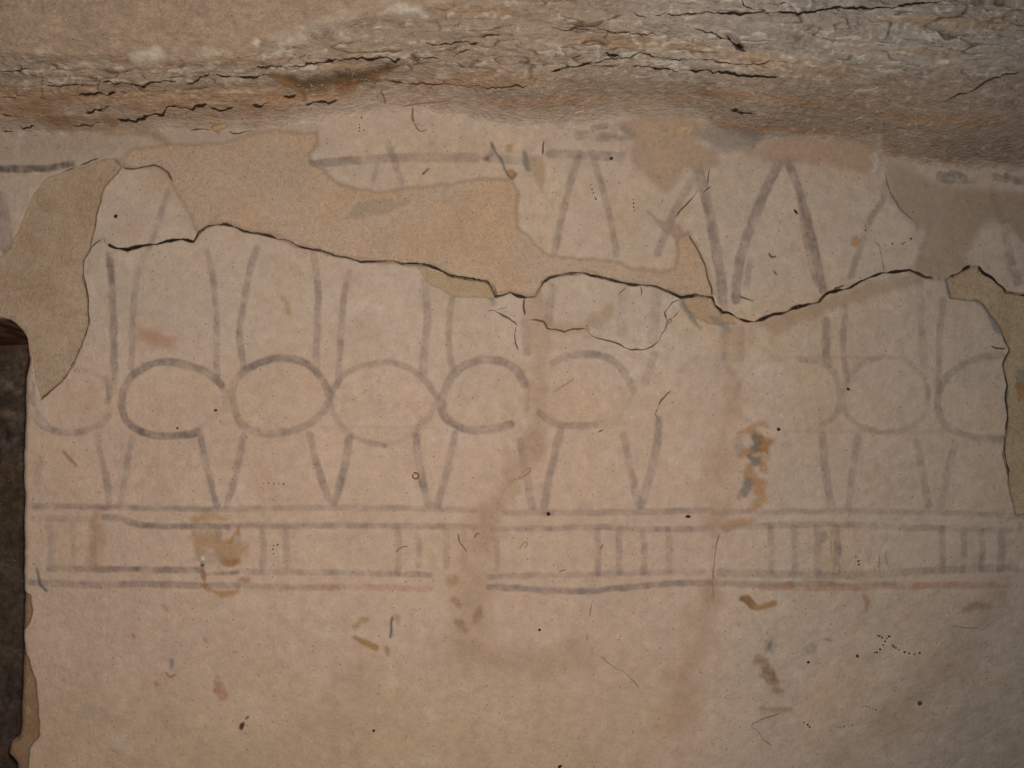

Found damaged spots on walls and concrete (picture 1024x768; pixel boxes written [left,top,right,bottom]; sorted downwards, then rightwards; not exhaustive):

crack [3,34,526,134]
crack [553,1,941,78]
crack [946,72,1019,101]
spalling [0,130,735,397]
crack [41,171,1024,400]
spalling [946,266,1024,515]